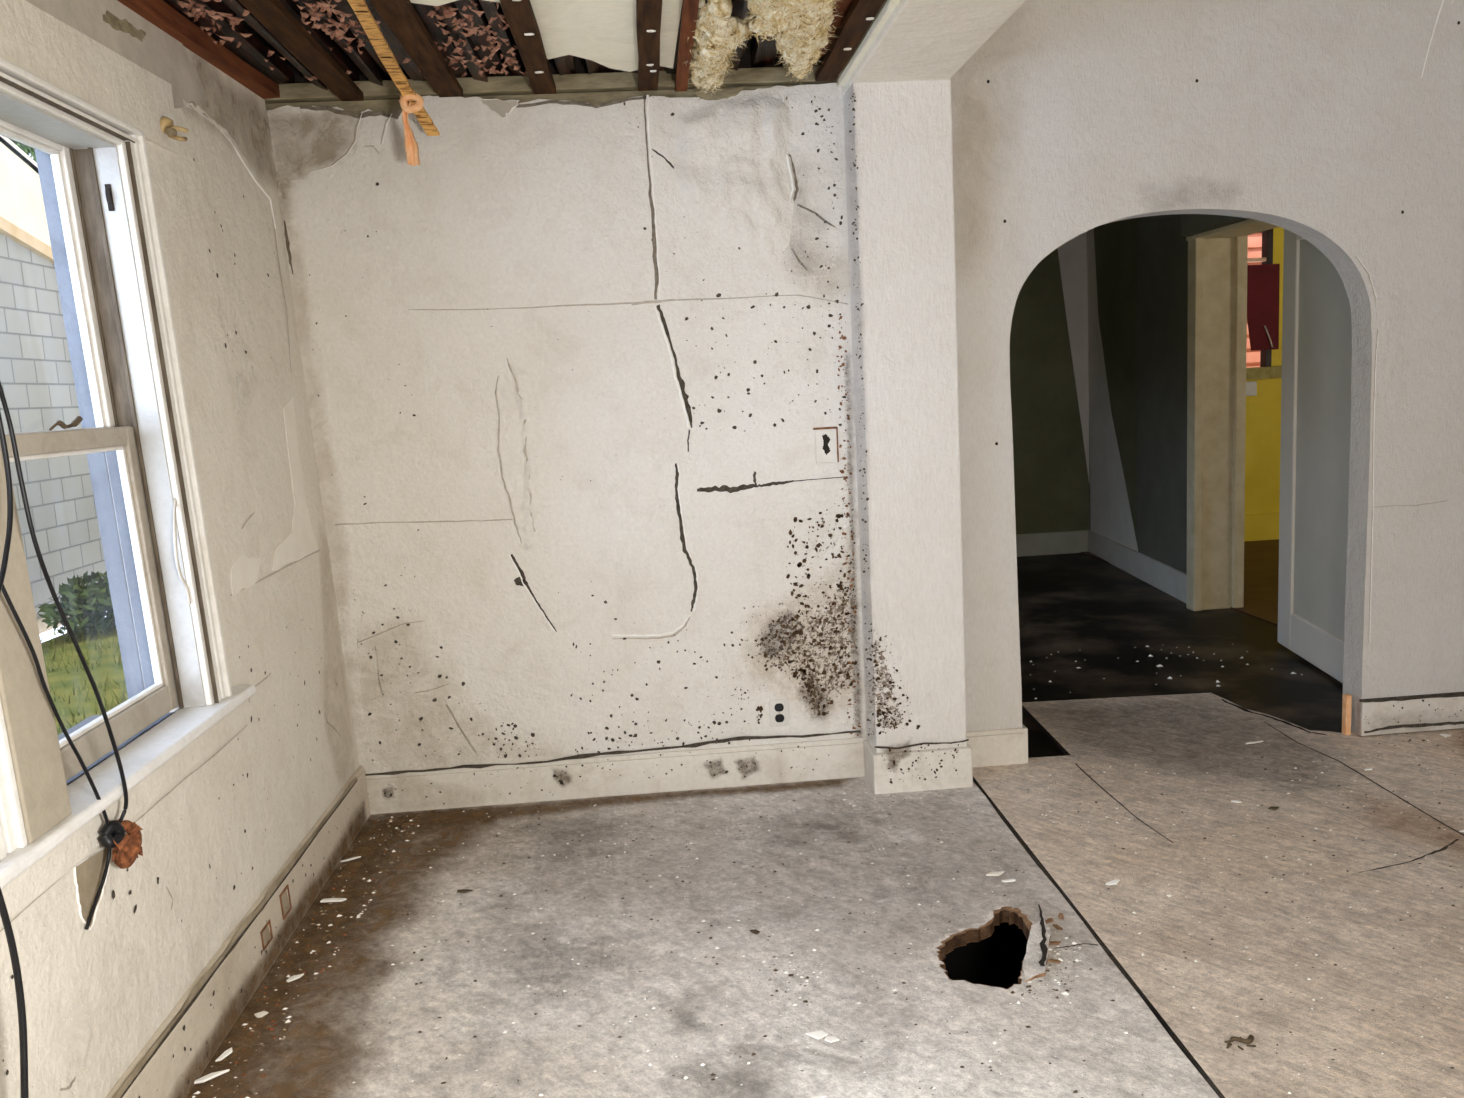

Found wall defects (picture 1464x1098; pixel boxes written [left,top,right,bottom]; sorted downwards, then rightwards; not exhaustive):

damp [189,60,343,197]
crack [230,519,557,632]
damp [164,500,959,1098]
crack [408,95,849,639]